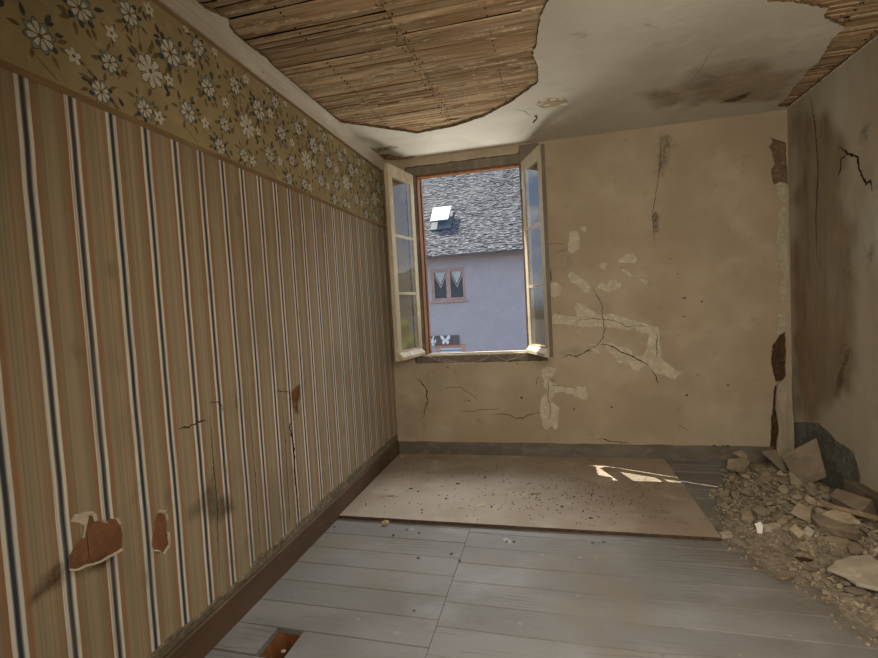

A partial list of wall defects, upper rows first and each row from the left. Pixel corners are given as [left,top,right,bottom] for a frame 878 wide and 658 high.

crack [418,377,572,419]
peeling [539,366,590,430]
peeling [551,272,623,298]
crack [563,289,658,383]
peeling [552,303,681,381]
crack [652,133,661,240]
spalling [770,333,786,450]
spalling [769,139,790,301]
damp [794,117,851,419]
crack [810,98,872,258]
peeling [147,434,397,658]